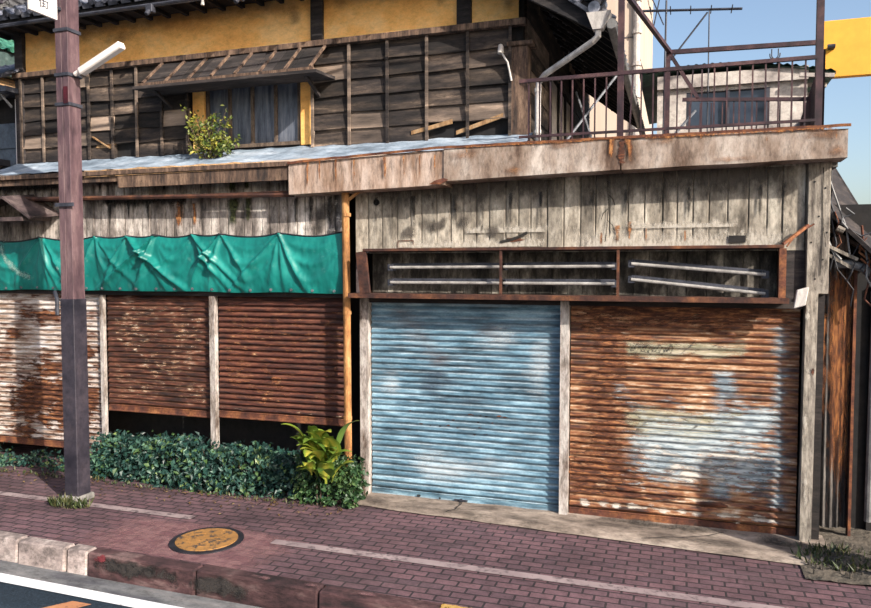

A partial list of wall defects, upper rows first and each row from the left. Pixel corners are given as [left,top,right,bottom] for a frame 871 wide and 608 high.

rust [455,140,593,156]
rust [609,139,632,165]
rust [647,127,837,139]
rust [0,347,64,441]
rust [5,306,61,339]
rust [87,344,109,438]
rust [223,305,342,407]
rust [558,306,792,501]
peeling [626,372,787,508]
rust [822,271,853,478]
peeling [581,499,777,523]
rust [696,501,782,511]